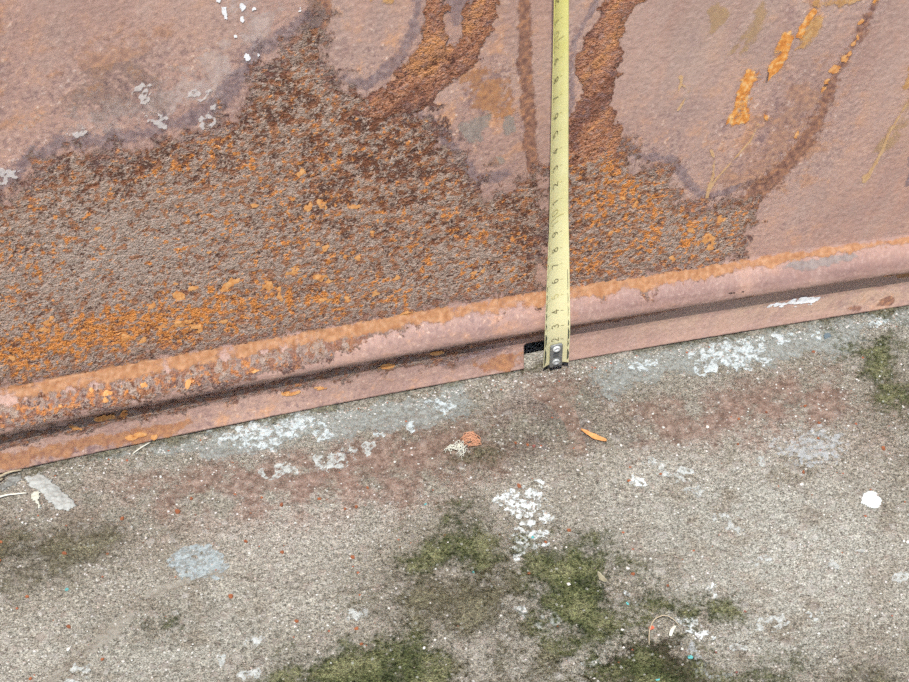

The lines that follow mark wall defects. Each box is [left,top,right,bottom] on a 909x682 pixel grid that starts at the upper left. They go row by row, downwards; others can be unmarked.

rust [568,0,909,329]
rust [0,0,551,451]
damp [643,456,704,497]
damp [492,479,555,561]
damp [891,572,909,582]
damp [345,609,368,620]
damp [755,614,790,632]
damp [675,617,733,681]
damp [64,663,90,682]
damp [236,668,261,681]